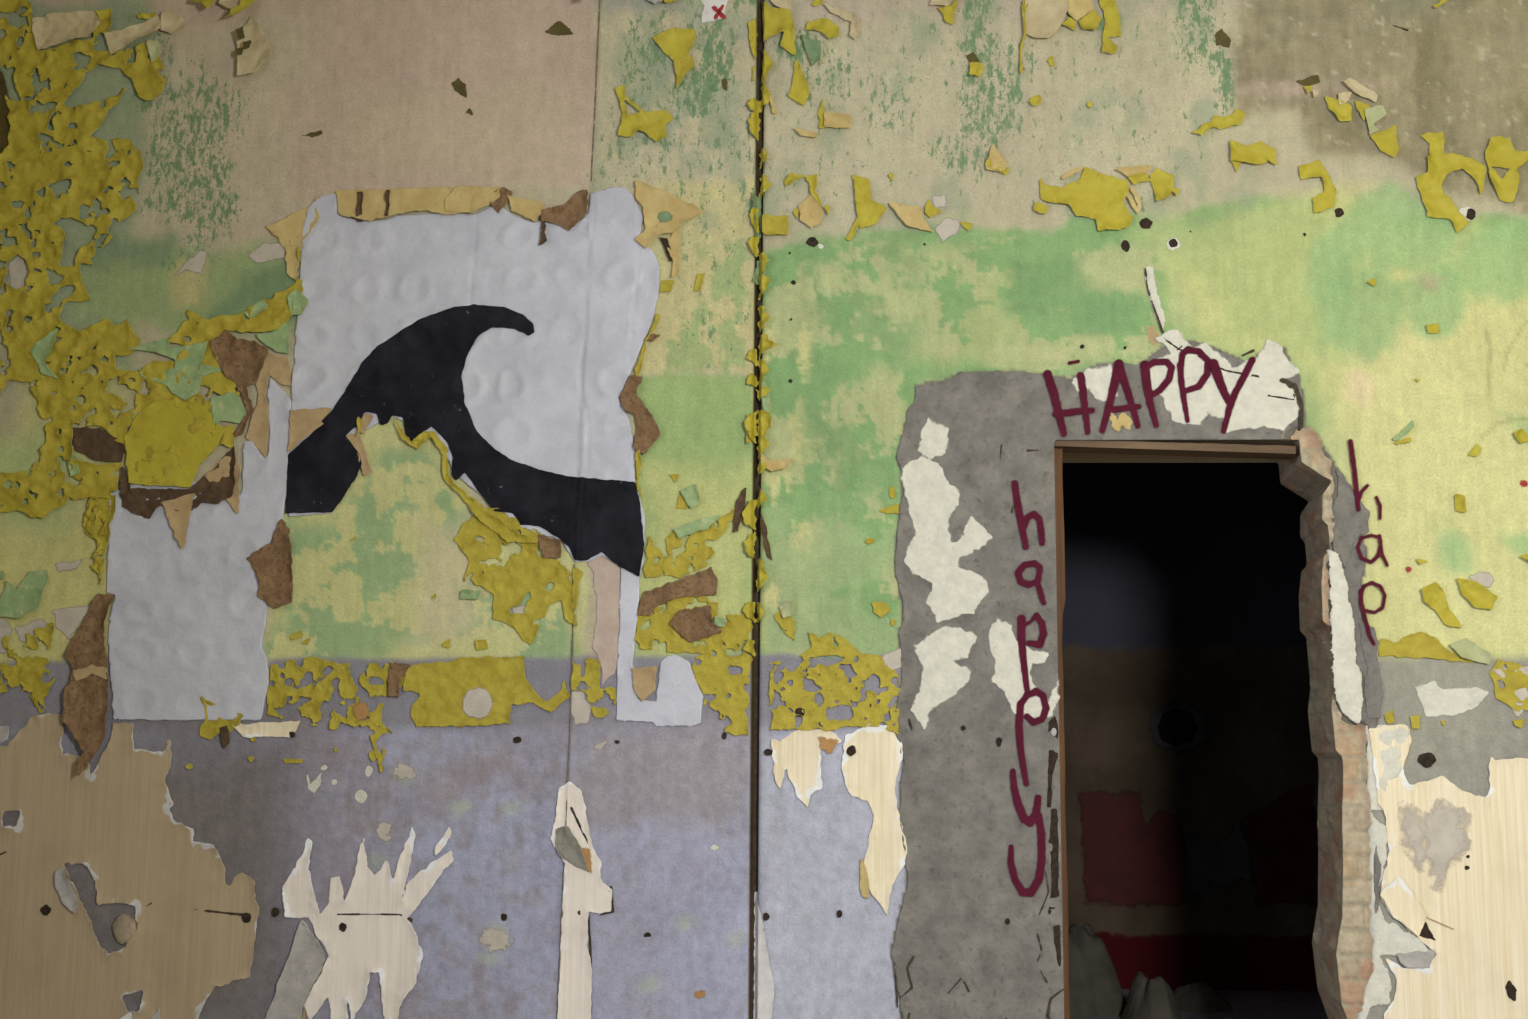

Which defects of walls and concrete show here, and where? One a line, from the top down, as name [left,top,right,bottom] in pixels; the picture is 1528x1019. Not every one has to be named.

peeling [1020,0,1122,73]
peeling [744,0,858,474]
peeling [845,174,972,242]
peeling [1033,165,1181,231]
peeling [1416,131,1528,232]
peeling [0,0,795,779]
peeling [1455,494,1467,512]
peeling [1456,572,1498,610]
flaking render [768,266,1354,1019]
peeling [1378,582,1528,729]
flaking render [1331,535,1395,1019]
peeling [434,827,452,855]